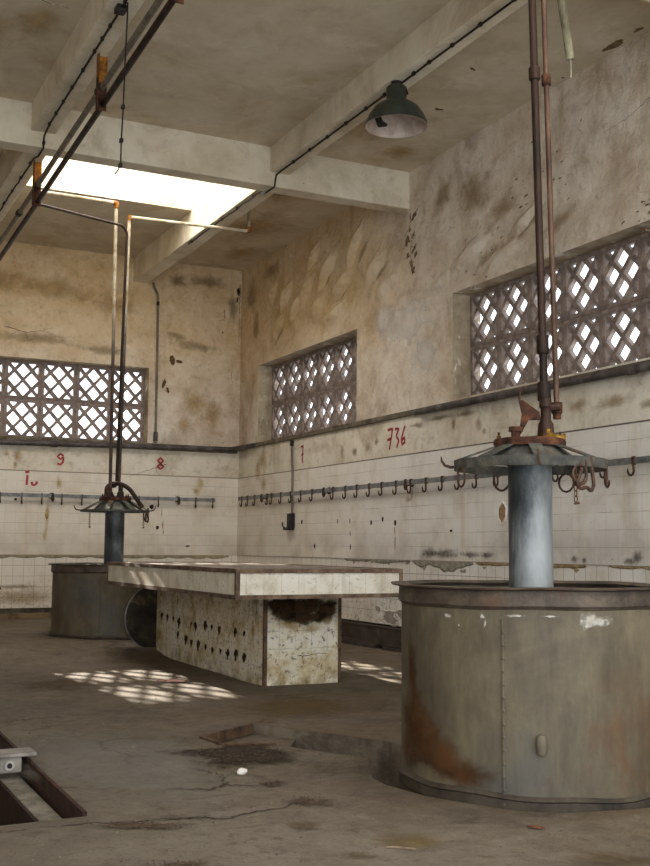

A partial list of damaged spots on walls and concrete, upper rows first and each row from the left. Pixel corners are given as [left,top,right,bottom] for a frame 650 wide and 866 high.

peeling [344,558,509,573]
peeling [553,564,586,573]
crack [169,767,252,790]
crack [51,803,294,830]